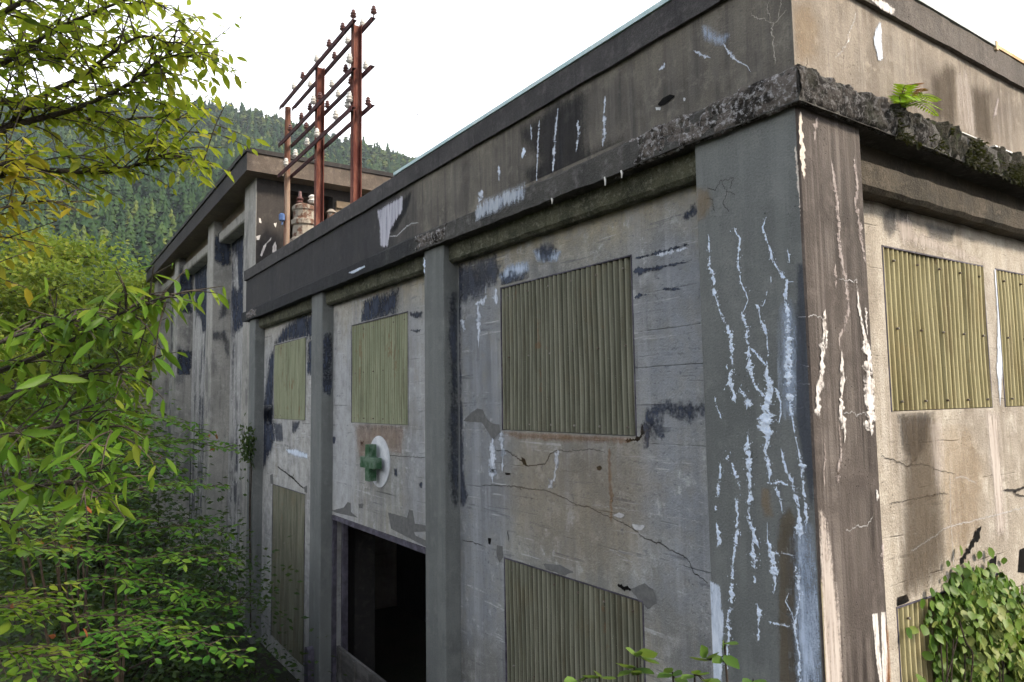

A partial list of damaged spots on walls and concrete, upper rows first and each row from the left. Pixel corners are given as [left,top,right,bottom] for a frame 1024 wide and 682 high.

crack [752,2,786,61]
water stain [476,97,610,217]
spalling [614,64,1024,216]
water stain [378,193,411,247]
water stain [633,244,689,276]
water stain [643,159,876,682]
crack [482,448,707,583]
crack [881,455,1024,562]